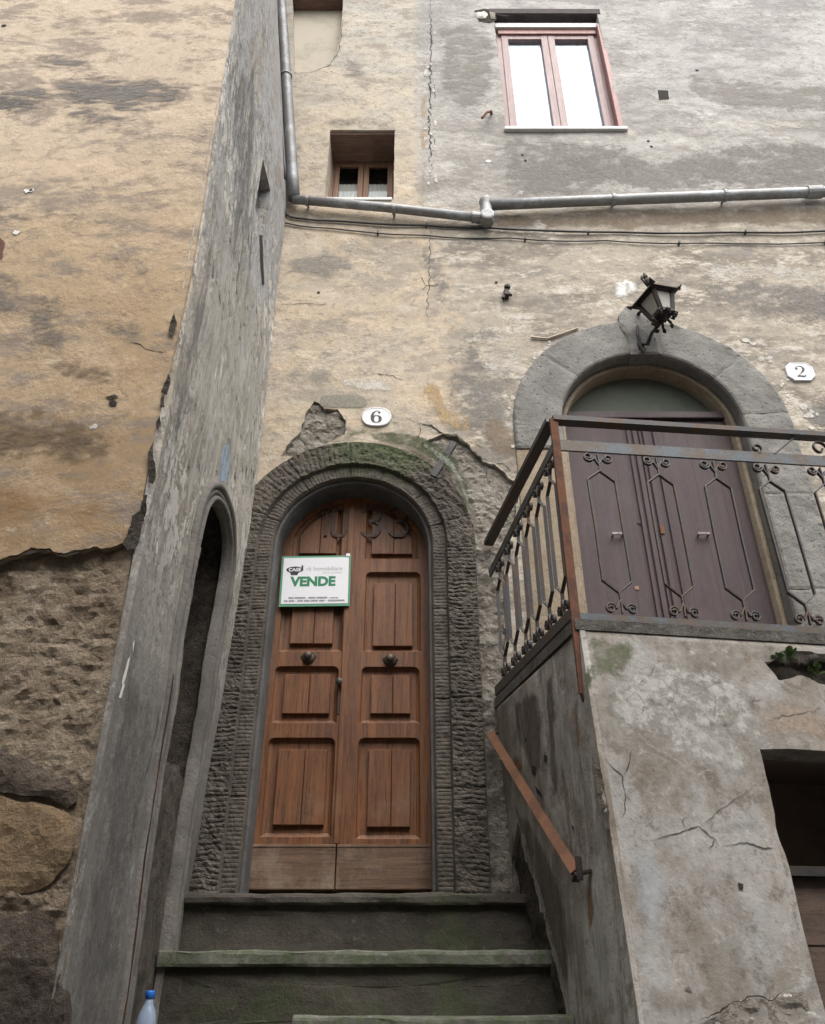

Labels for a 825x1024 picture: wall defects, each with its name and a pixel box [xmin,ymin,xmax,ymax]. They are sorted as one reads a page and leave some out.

leakage [0,54,188,126]
crack [422,0,440,320]
spalling [168,314,177,336]
spalling [156,374,170,429]
leakage [0,411,106,460]
spalling [283,405,346,457]
hole [767,657,825,685]
spalling [0,443,156,1024]
spalling [425,435,569,997]
crack [603,753,631,893]
crack [655,791,771,849]